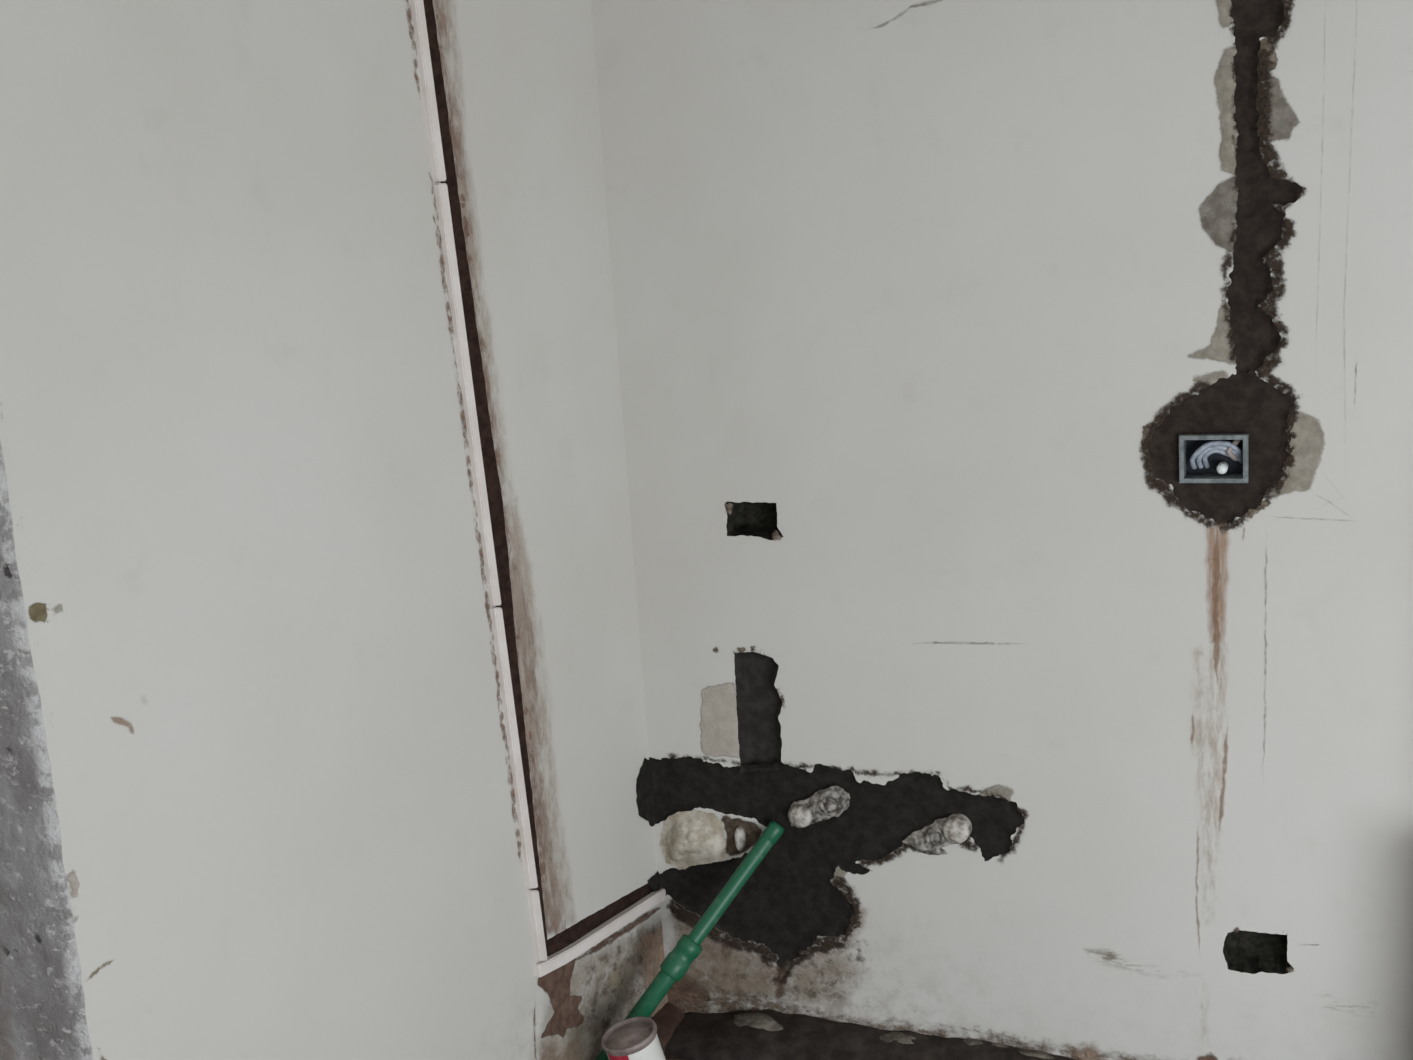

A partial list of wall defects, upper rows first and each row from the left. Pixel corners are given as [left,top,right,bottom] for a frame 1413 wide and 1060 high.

spalling [1140,370,1324,531]
rust [1208,527,1227,672]
spalling [636,754,1028,983]
peeling [533,958,584,1060]
damp [549,928,665,1060]
damp [649,930,1137,1060]